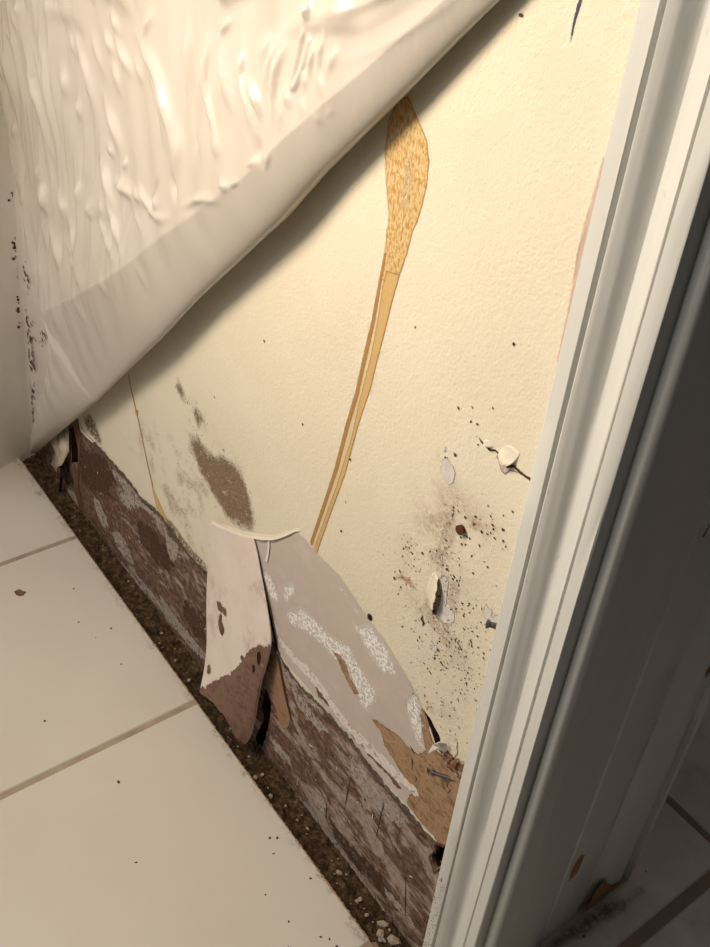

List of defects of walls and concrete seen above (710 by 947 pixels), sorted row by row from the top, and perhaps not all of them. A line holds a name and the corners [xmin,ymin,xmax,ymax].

mould [11,241,46,371]
peeling [555,157,605,372]
peeling [38,418,207,672]
mould [169,374,260,530]
mould [393,505,514,737]
peeling [483,440,520,466]
crack [479,439,531,480]
peeling [211,520,465,947]